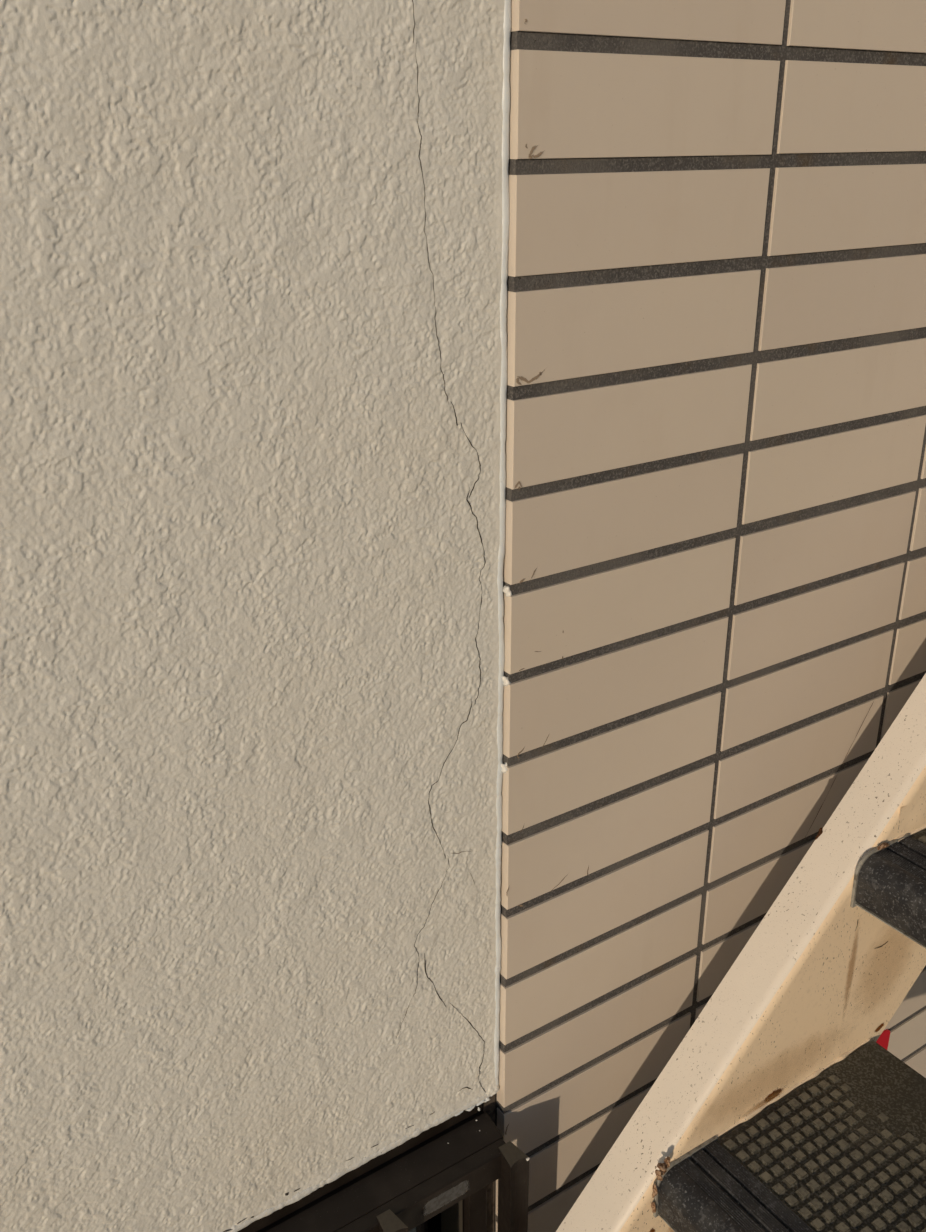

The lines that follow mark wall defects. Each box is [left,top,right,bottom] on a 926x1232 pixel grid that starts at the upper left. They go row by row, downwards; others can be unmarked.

crack [393,0,485,1091]